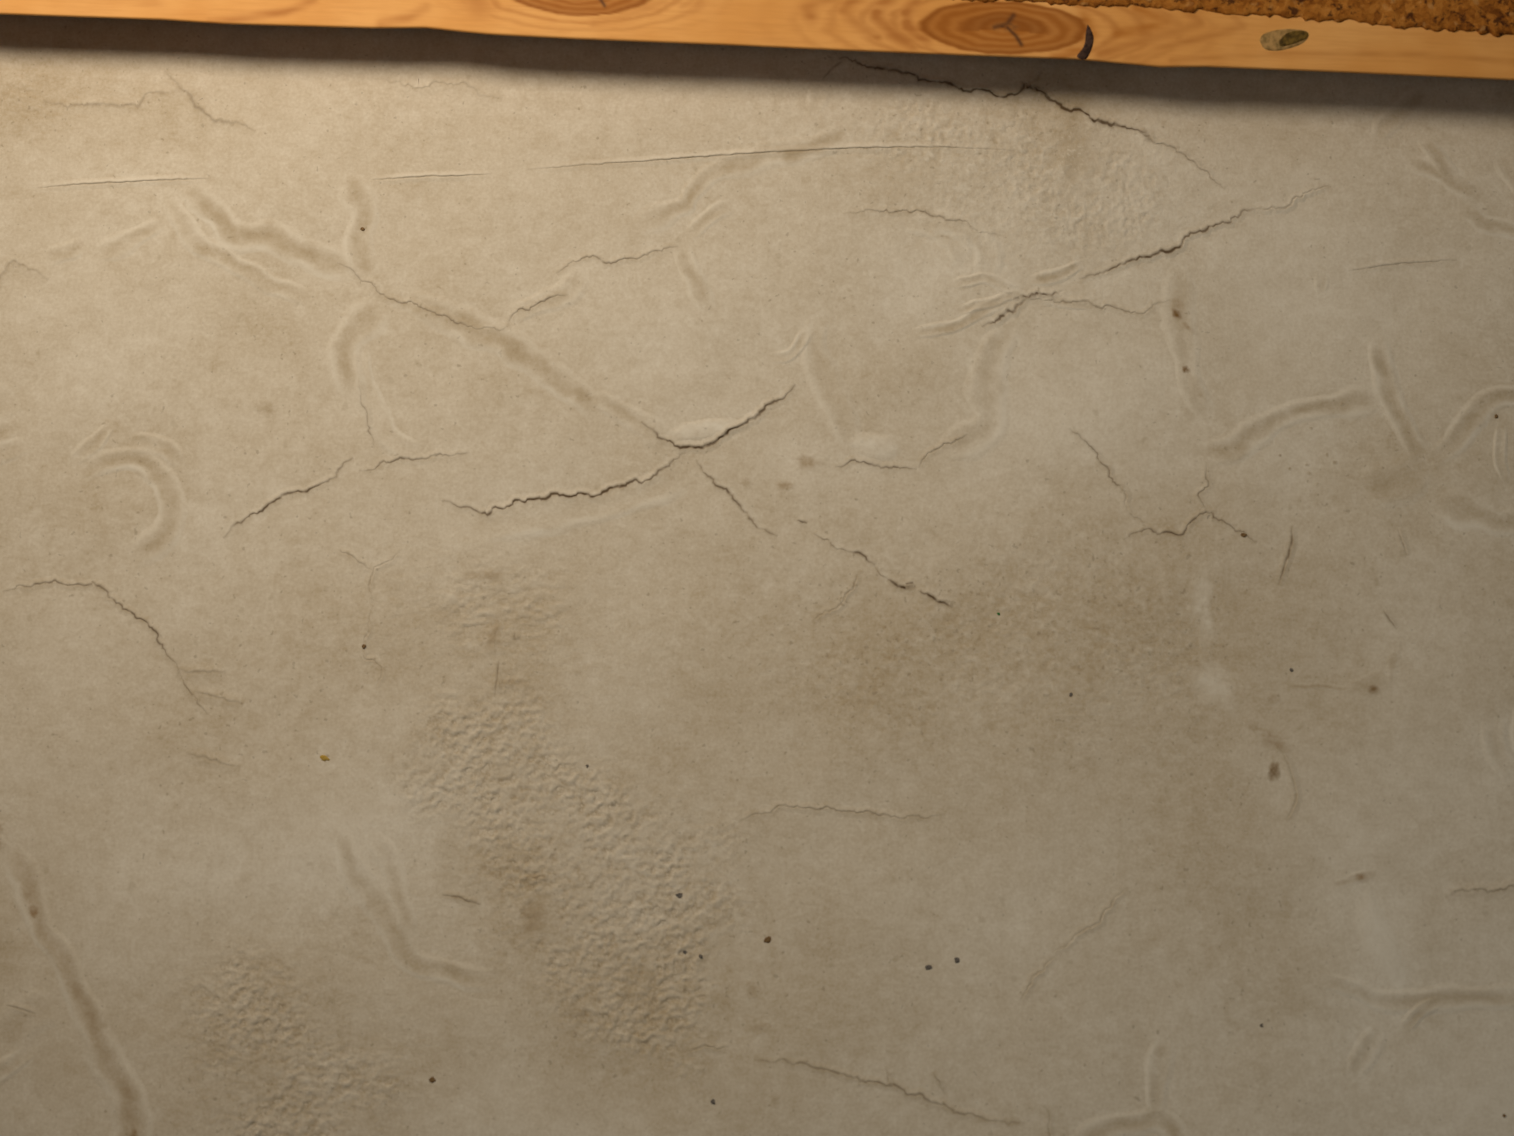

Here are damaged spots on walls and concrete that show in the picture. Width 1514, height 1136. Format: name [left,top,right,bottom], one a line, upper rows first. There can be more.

crack [379,71,504,106]
crack [817,51,1330,333]
crack [334,241,679,336]
crack [221,381,970,626]
crack [1066,425,1259,546]
crack [2,574,226,717]